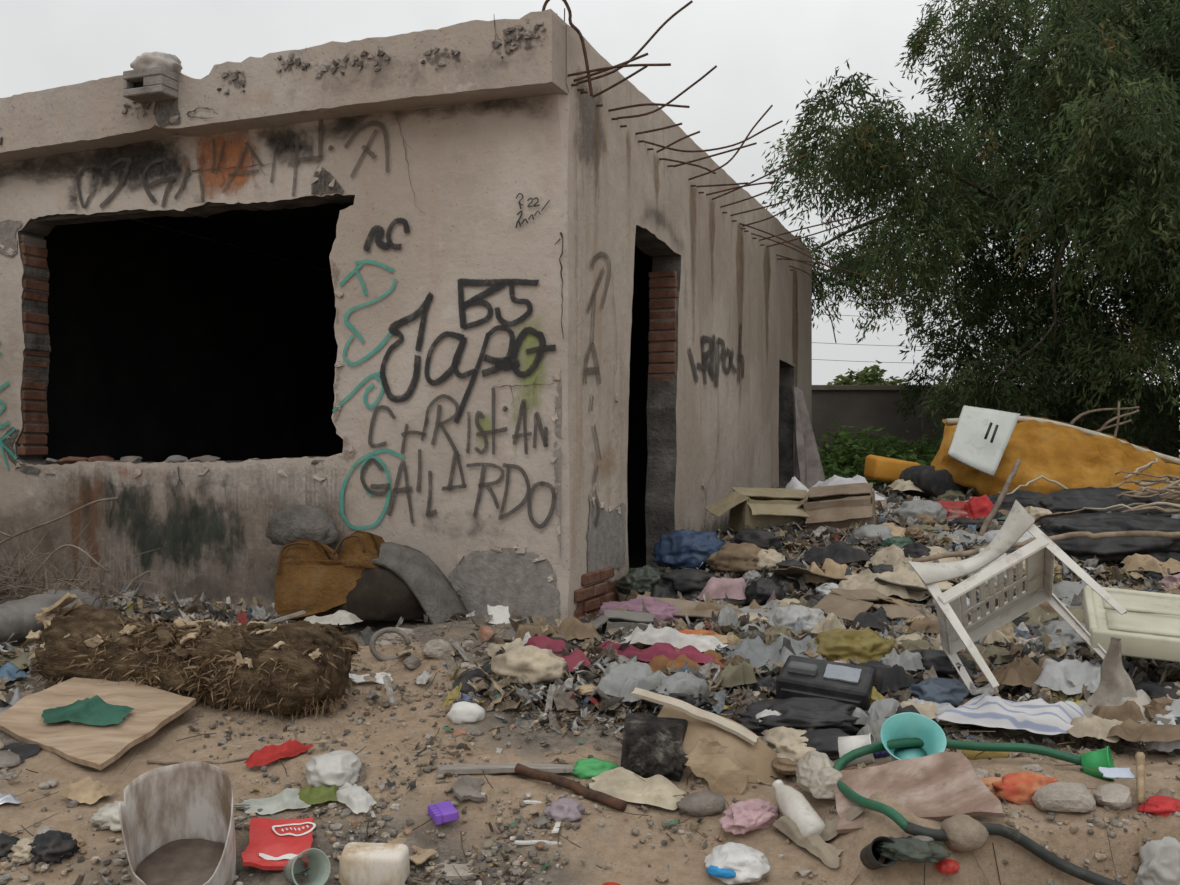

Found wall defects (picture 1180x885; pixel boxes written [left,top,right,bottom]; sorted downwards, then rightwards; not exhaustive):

peeling [276,49,391,78]
peeling [420,47,460,69]
leakage [0,485,284,603]